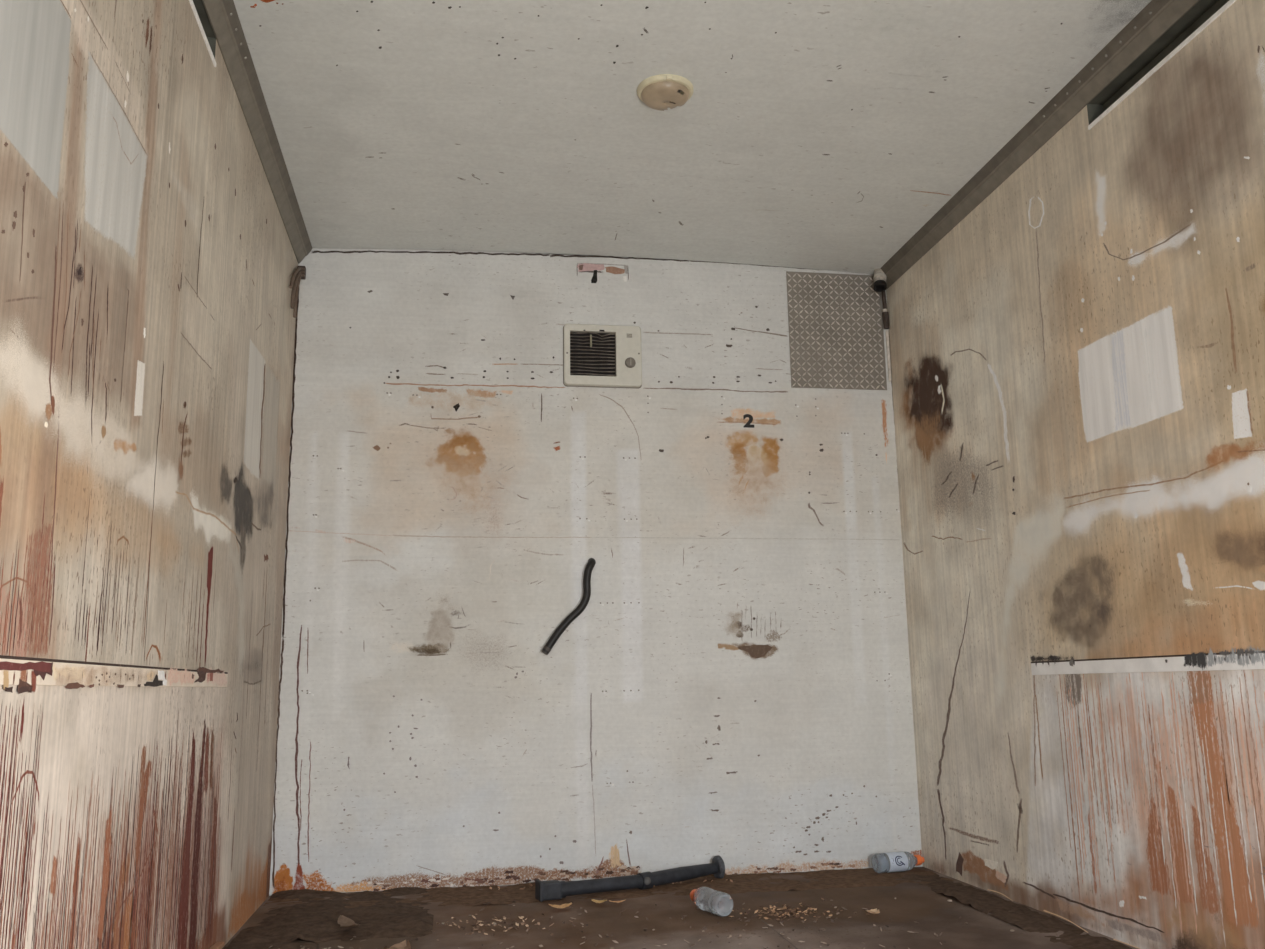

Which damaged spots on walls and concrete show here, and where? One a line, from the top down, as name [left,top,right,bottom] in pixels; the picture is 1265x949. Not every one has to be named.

leakage [177,402,192,483]
corrosion [372,386,530,522]
corrosion [713,408,800,531]
leakage [1204,434,1265,475]
corrosion [0,201,395,949]
leakage [1034,543,1120,652]
leakage [1176,552,1212,607]
leakage [1203,522,1265,590]
corrosion [1057,670,1265,944]